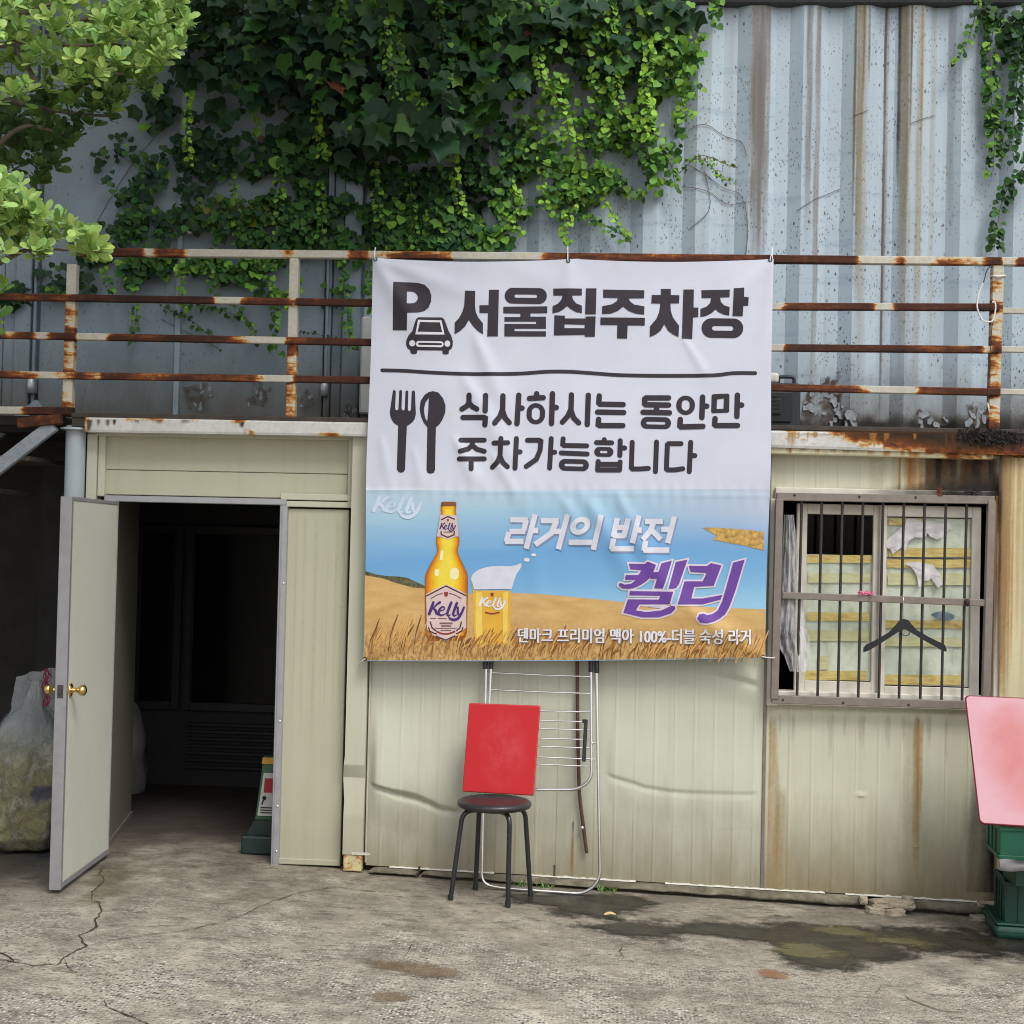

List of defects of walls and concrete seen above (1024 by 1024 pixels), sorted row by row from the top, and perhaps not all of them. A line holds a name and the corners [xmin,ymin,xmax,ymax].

peeling [802,372,857,426]
peeling [915,409,949,428]
peeling [965,401,986,428]
corrosion [850,432,1020,667]
crack [0,867,334,1024]
water stain [503,893,1024,972]